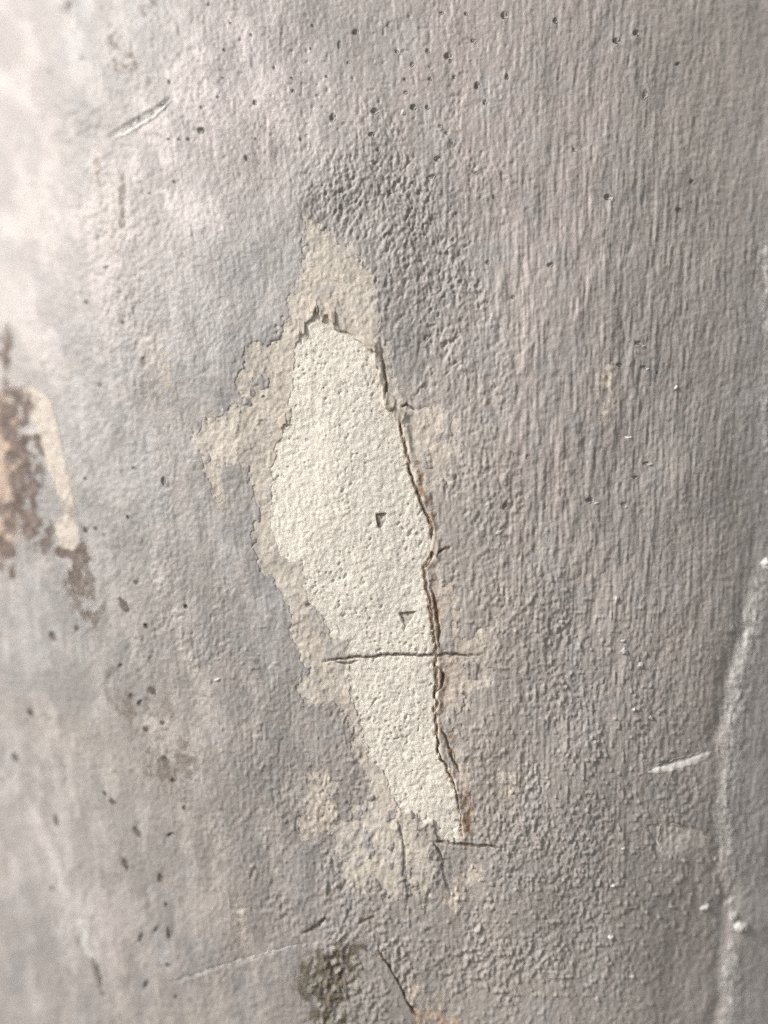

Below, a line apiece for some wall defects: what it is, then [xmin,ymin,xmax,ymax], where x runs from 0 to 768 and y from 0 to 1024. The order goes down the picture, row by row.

rust [0,325,80,578]
peeling [187,216,506,916]
crack [324,342,504,910]